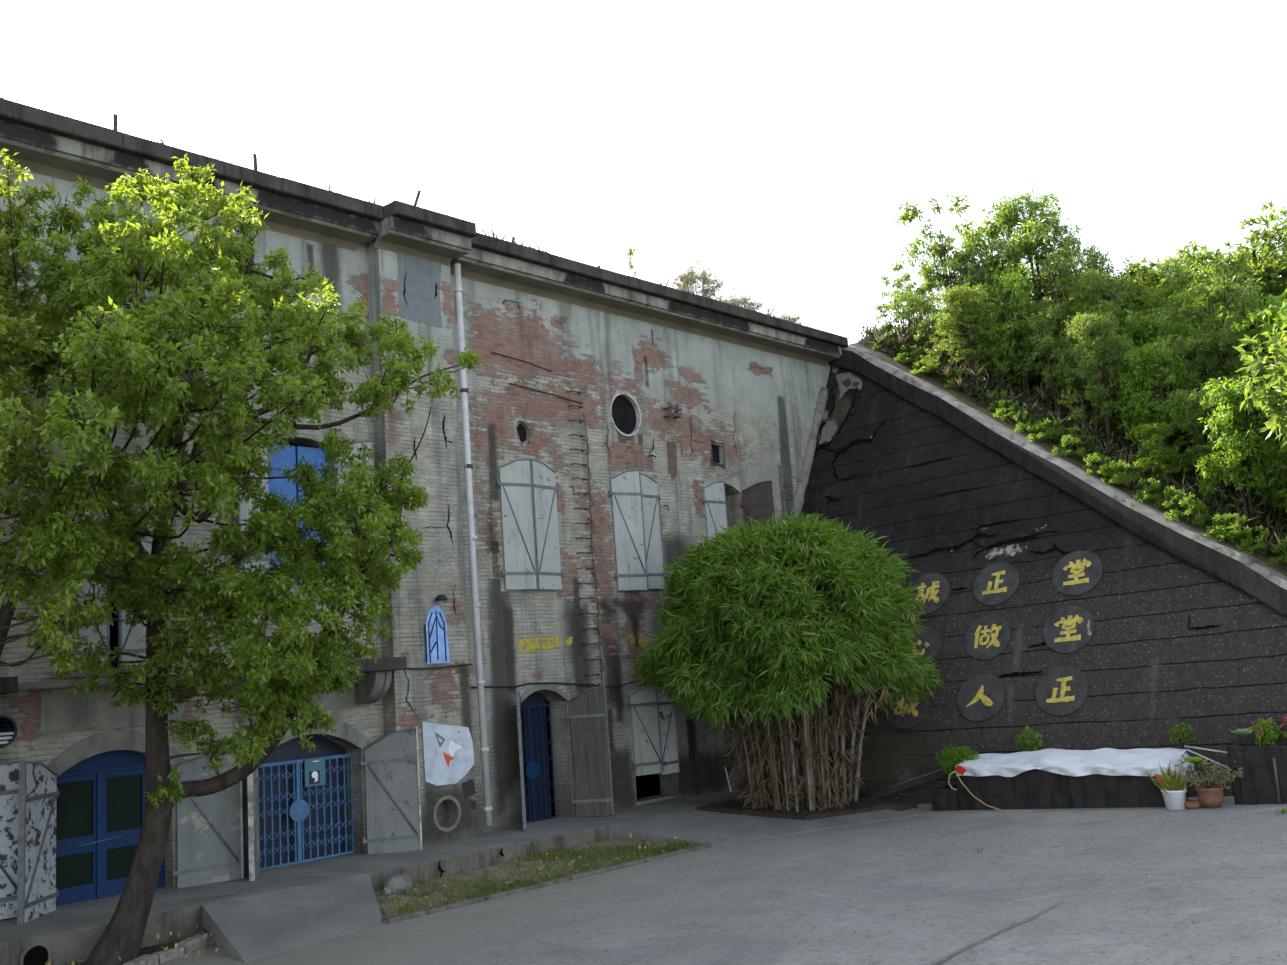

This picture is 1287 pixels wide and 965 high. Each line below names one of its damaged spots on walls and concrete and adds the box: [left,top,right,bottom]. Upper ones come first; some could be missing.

peeling [748,362,773,377]
peeling [347,254,753,679]
crack [814,388,887,504]
crack [909,519,1085,558]